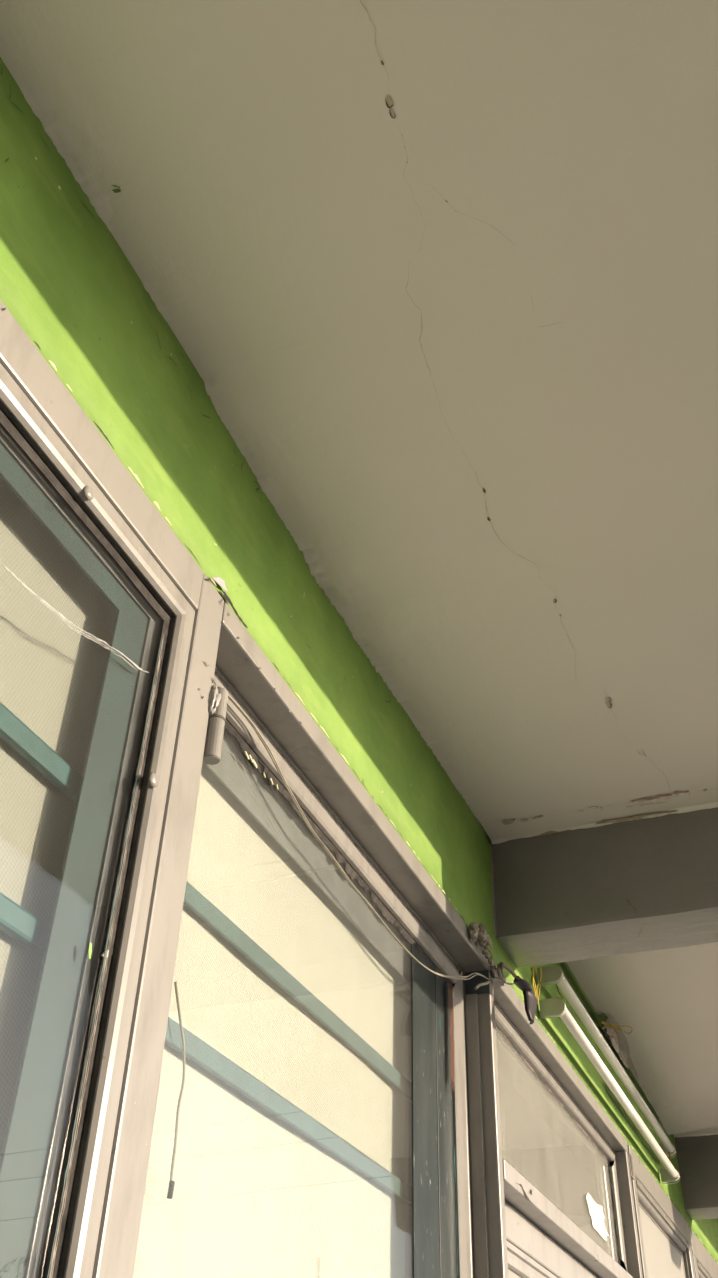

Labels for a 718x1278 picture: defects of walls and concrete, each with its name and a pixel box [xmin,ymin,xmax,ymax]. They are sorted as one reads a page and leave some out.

peeling [578,789,707,824]